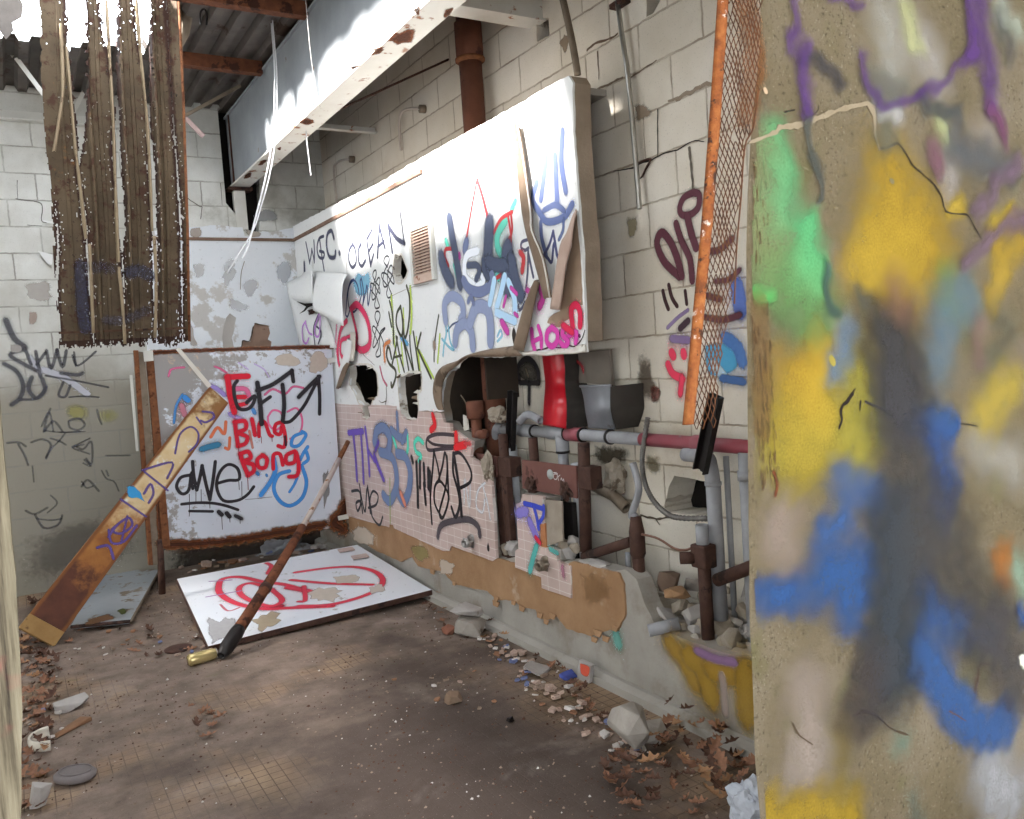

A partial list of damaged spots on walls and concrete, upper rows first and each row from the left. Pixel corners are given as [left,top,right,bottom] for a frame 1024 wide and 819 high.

corrosion [371,29,415,55]
crack [614,81,712,189]
crack [875,105,981,238]
peeling [247,210,277,237]
spalling [349,517,627,643]
peeling [207,618,236,643]
peeling [252,611,281,632]